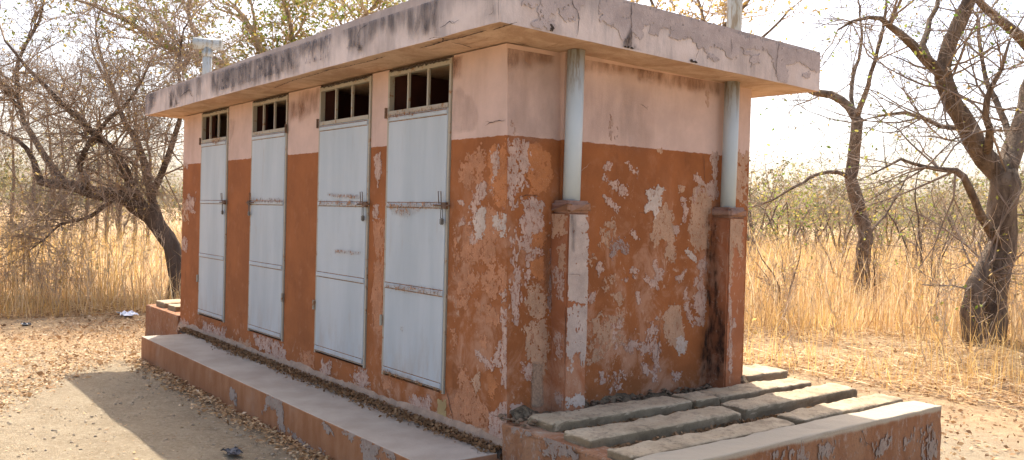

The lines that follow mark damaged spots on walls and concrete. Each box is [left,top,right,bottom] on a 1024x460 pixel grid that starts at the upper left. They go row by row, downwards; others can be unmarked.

leakage [348,14,393,50]
peeling [599,0,821,83]
leakage [212,48,289,90]
peeling [373,151,382,188]
peeling [447,120,719,460]
leakage [702,224,725,377]
peeling [261,394,325,455]
peeling [360,438,396,460]
peeling [860,423,938,460]